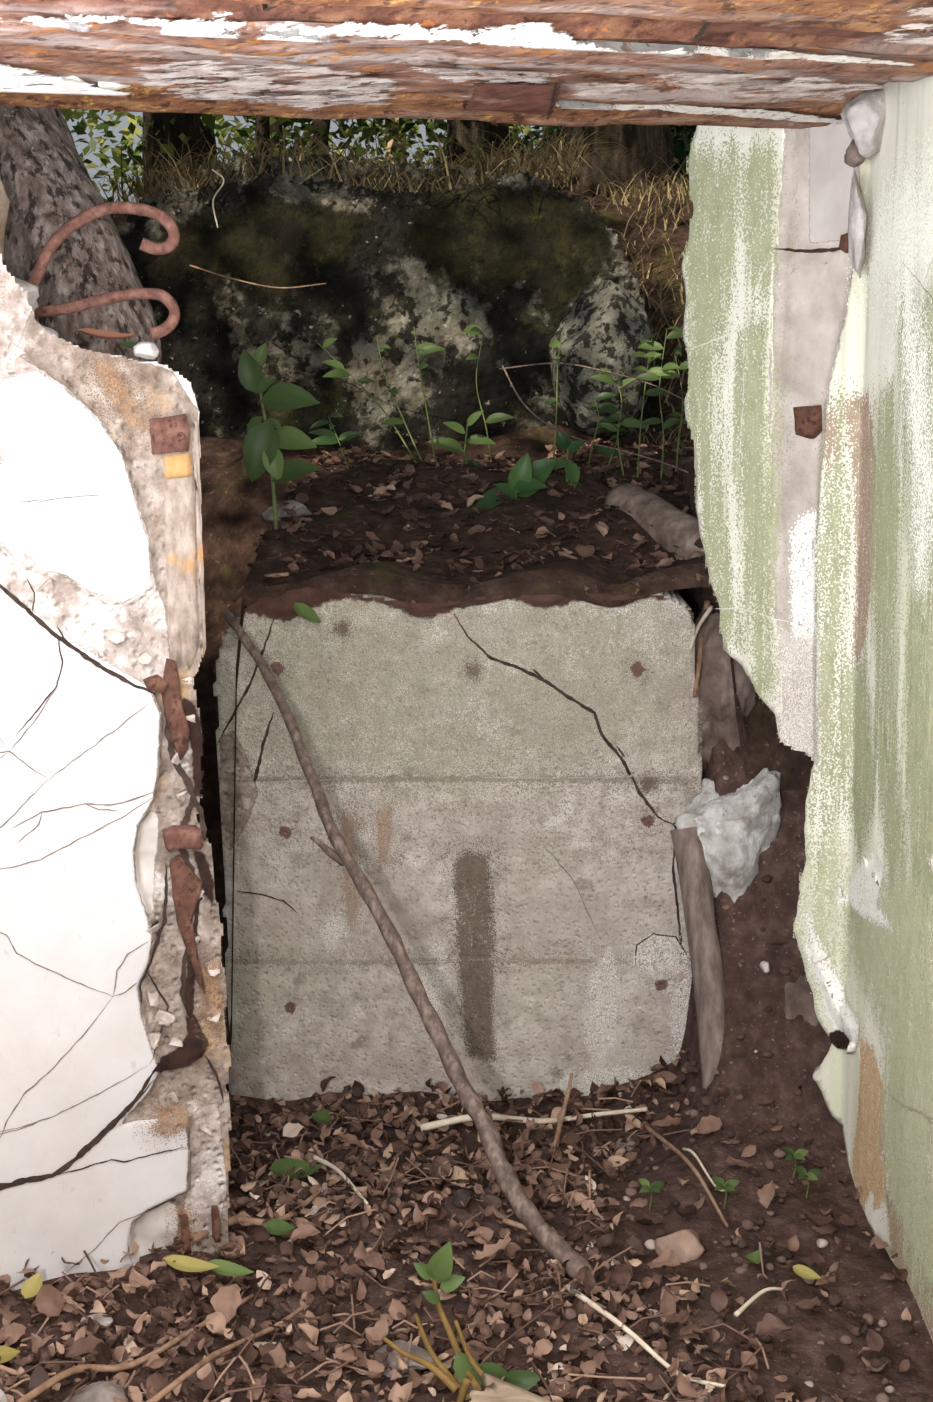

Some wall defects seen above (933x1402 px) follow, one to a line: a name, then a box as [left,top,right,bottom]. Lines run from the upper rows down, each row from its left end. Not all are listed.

peeling [161,13,239,39]
peeling [0,60,406,111]
peeling [257,21,332,43]
peeling [410,65,883,100]
damp [720,128,802,703]
damp [793,123,933,1024]
crack [217,621,274,784]
crack [0,579,224,1191]
corrosion [198,956,228,1038]
damp [413,847,499,1063]
crack [454,614,688,1050]
corrosion [148,1100,193,1142]